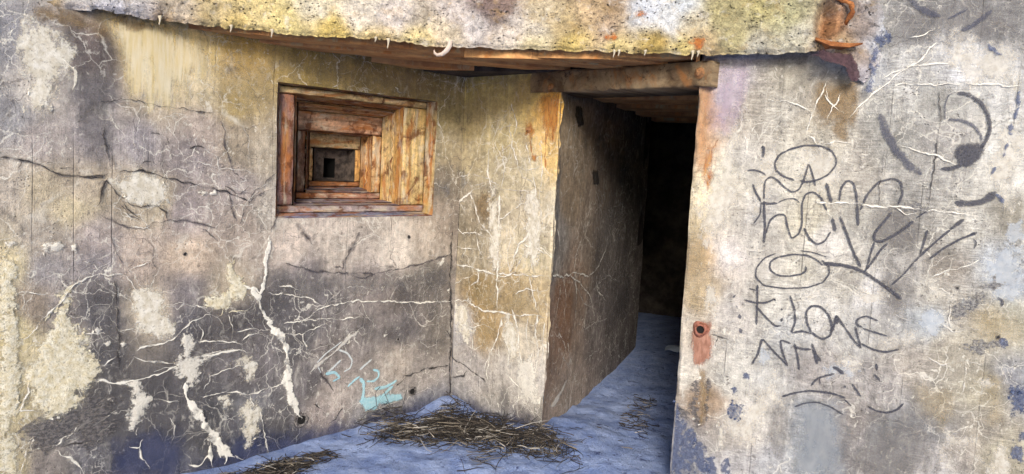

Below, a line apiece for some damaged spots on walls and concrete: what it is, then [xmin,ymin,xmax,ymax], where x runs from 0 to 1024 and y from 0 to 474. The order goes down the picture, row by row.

corrosion [526,95,559,168]
peeling [0,249,122,474]
peeling [131,288,176,340]
crack [0,98,616,467]
corrosion [692,322,711,422]
crack [57,450,83,471]